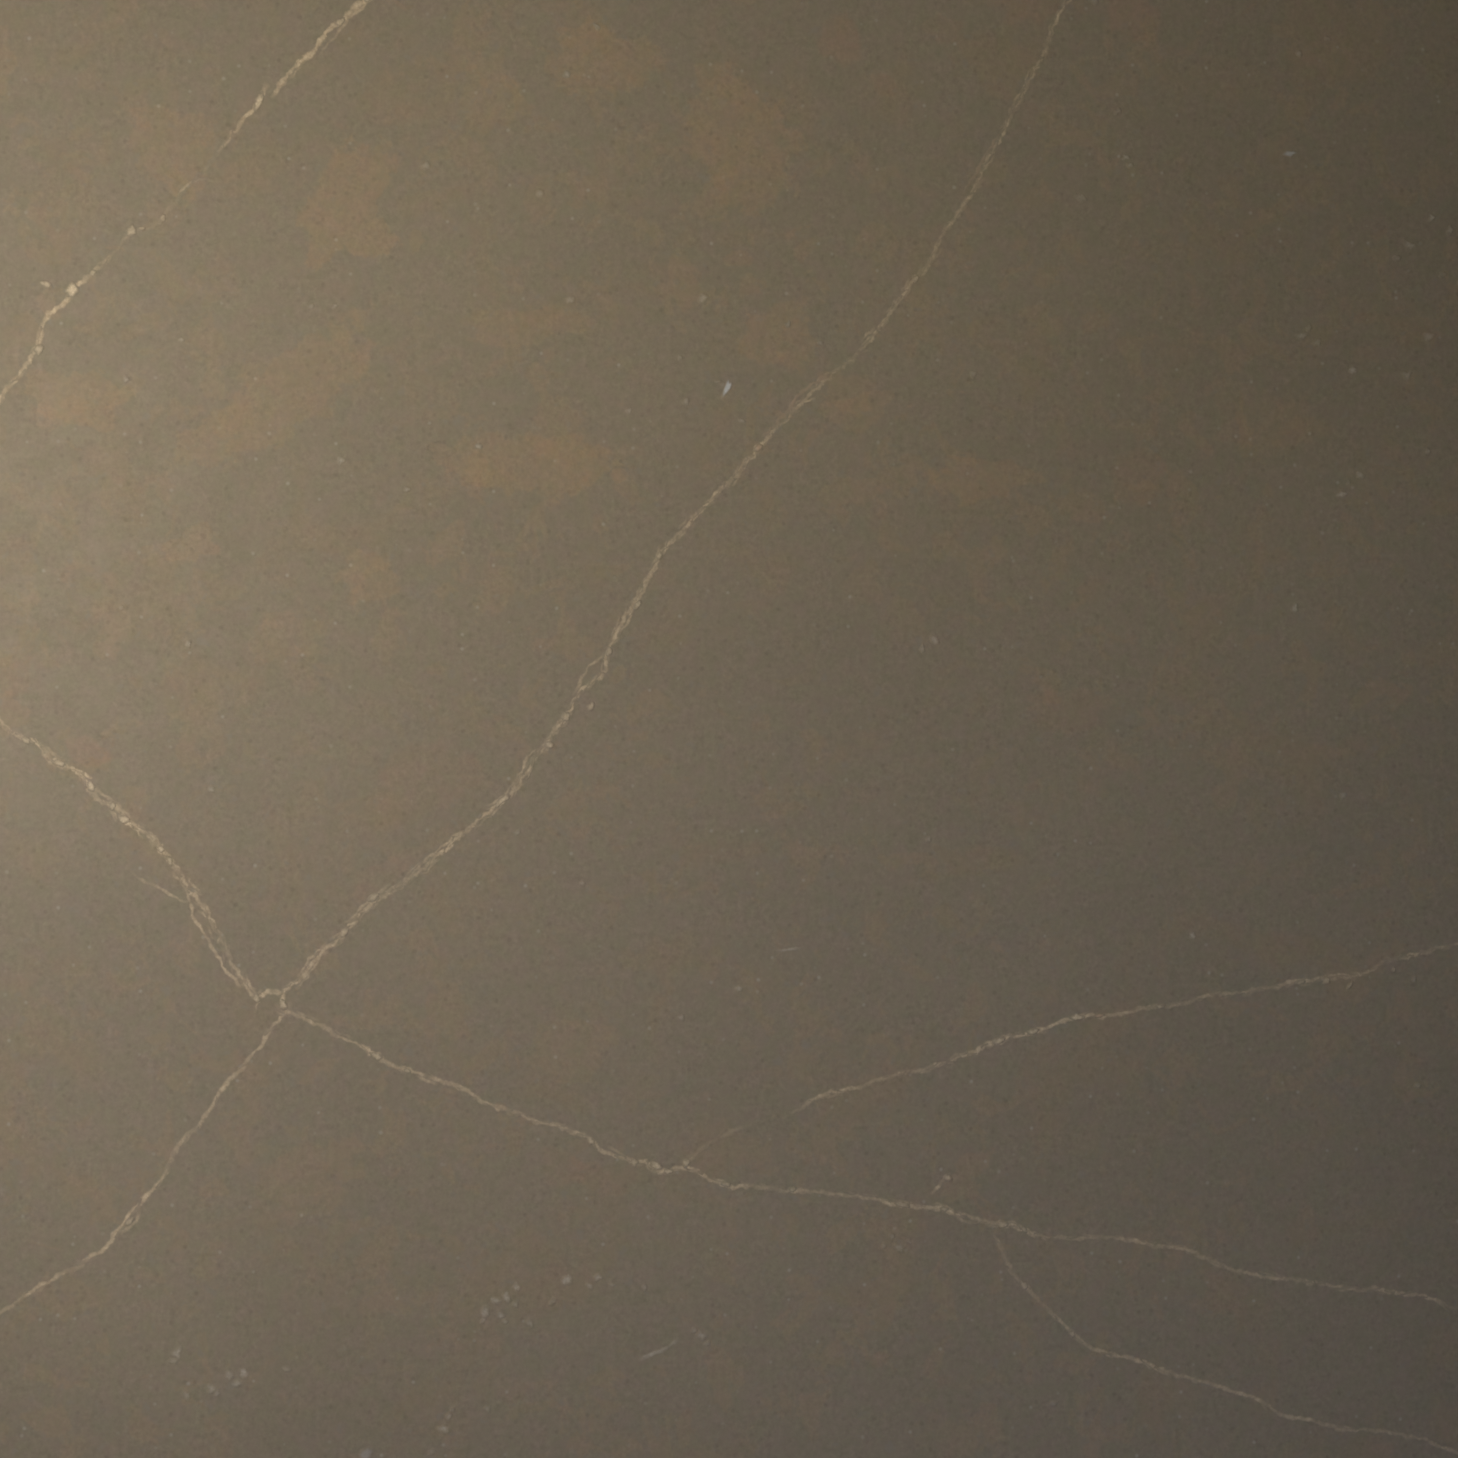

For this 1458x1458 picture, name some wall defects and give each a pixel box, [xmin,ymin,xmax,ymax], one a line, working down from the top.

crack [0,0,1073,1014]
crack [0,942,1458,1316]
crack [989,1232,1458,1456]